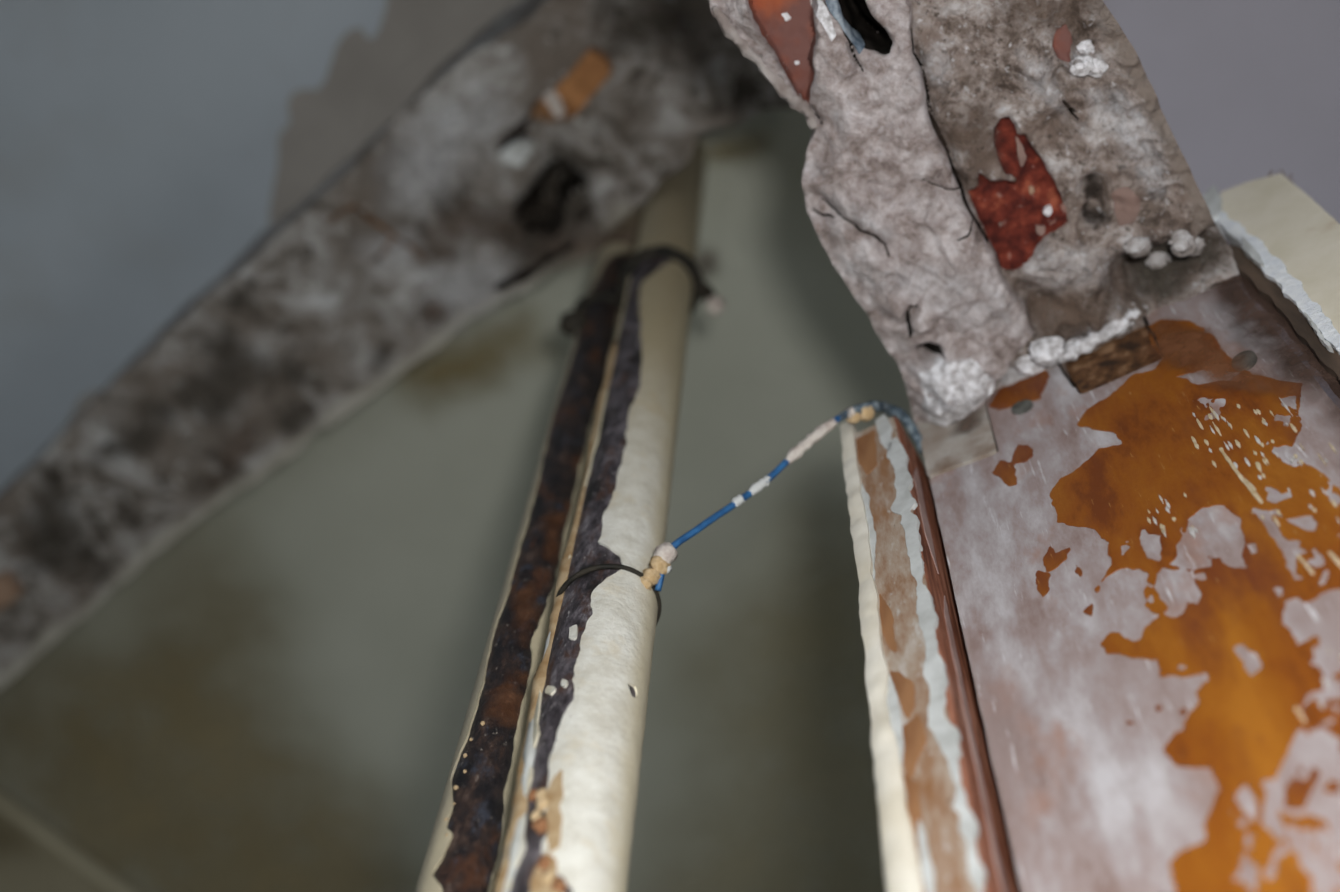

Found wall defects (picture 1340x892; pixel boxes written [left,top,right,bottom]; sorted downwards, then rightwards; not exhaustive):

flaking render [748,0,816,104]
crack [911,28,988,243]
flaking render [968,117,1068,270]
spalling [1083,174,1106,222]
peeling [1149,319,1232,362]
peeling [989,370,1050,410]
peeling [992,444,1033,486]
peeling [1035,546,1083,597]
peeling [1050,359,1340,892]
rust [489,674,528,722]
rust [527,787,548,835]
rust [536,855,567,892]